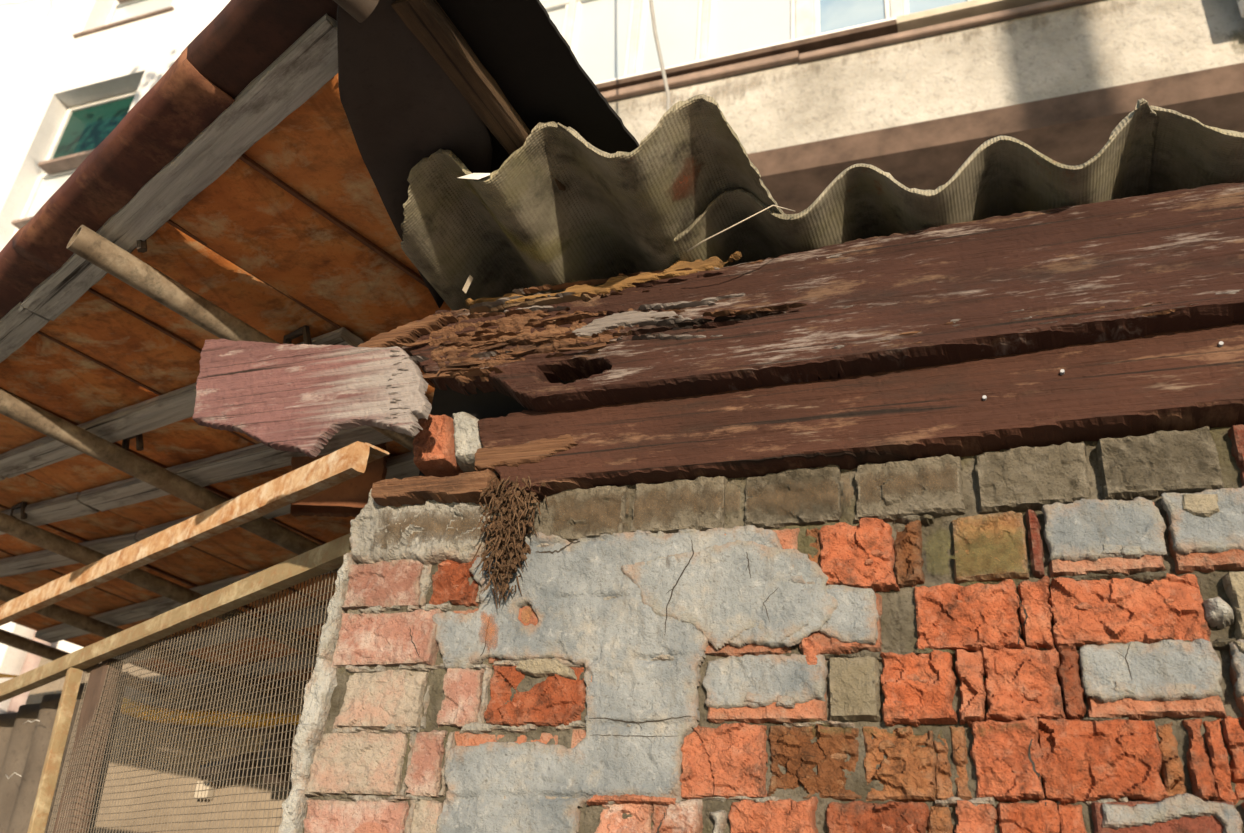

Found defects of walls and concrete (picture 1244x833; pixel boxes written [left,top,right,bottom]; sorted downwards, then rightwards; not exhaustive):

flaking render [1042,486,1244,562]
crack [664,540,694,636]
flaking render [429,517,1244,833]